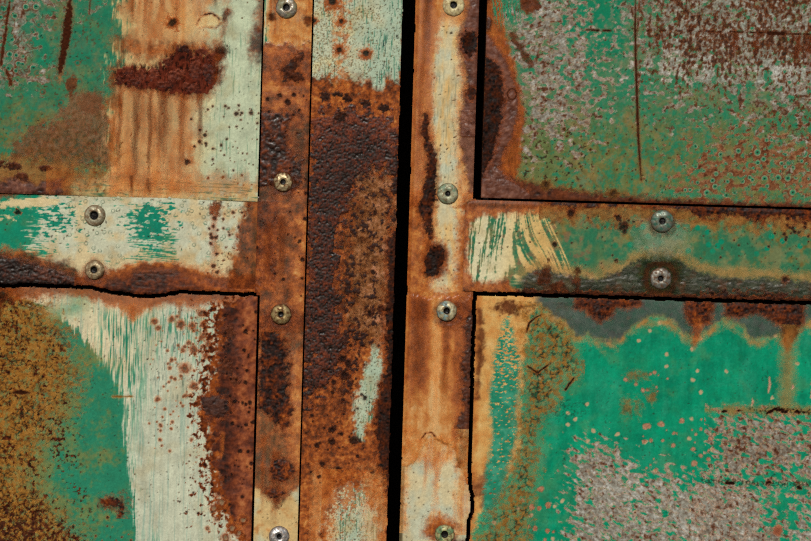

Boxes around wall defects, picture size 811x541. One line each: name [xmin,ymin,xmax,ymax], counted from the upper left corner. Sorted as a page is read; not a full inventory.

spalling [223,93,307,128]
peeling [0,198,60,219]
rust [0,0,401,541]
spalling [207,204,250,278]
rust [402,0,811,541]
spalling [614,215,643,234]
spalling [0,297,103,541]
spalling [148,310,213,452]
spalling [222,332,254,429]
peeling [528,404,811,541]